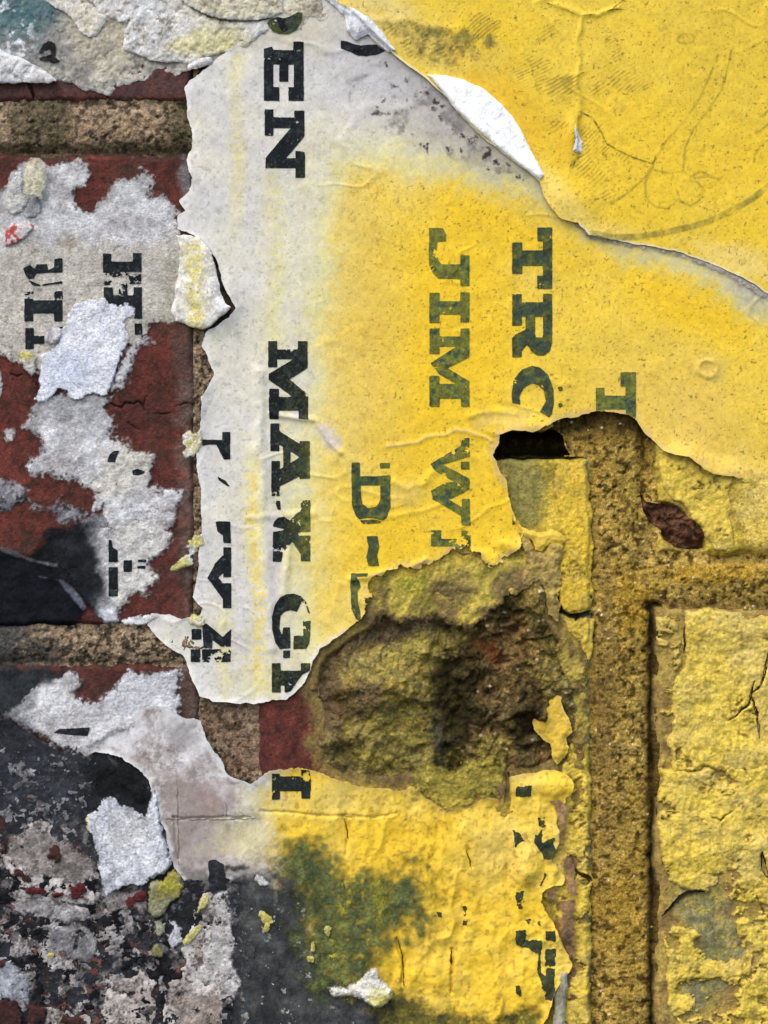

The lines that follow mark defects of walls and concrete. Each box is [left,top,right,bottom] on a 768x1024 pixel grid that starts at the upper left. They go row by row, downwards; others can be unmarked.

peeling [4,158,48,247]
peeling [171,235,231,330]
peeling [18,298,135,402]
peeling [182,430,202,458]
peeling [639,452,768,552]
peeling [171,534,204,571]
peeling [189,614,205,627]
spalling [309,462,595,1024]
crack [730,654,768,738]
peeling [86,788,210,958]